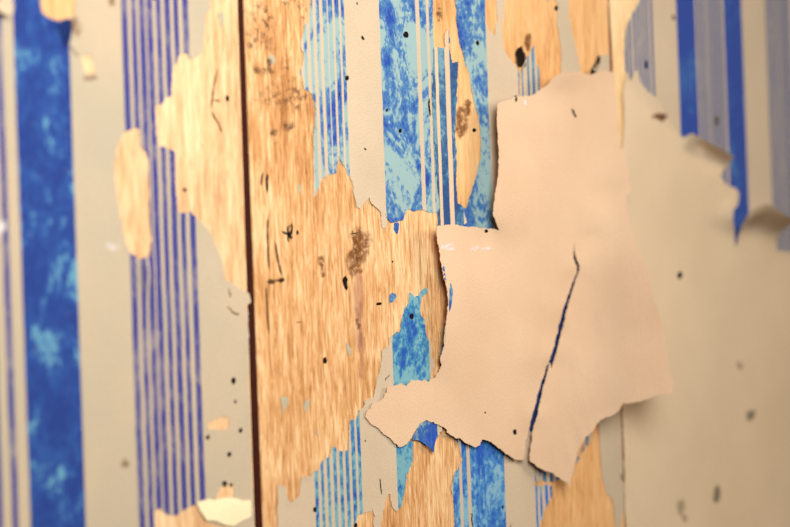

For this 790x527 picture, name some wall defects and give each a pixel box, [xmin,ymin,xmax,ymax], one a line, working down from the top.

peeling [0,0,14,17]
peeling [40,0,76,45]
peeling [114,128,152,259]
peeling [154,0,673,527]